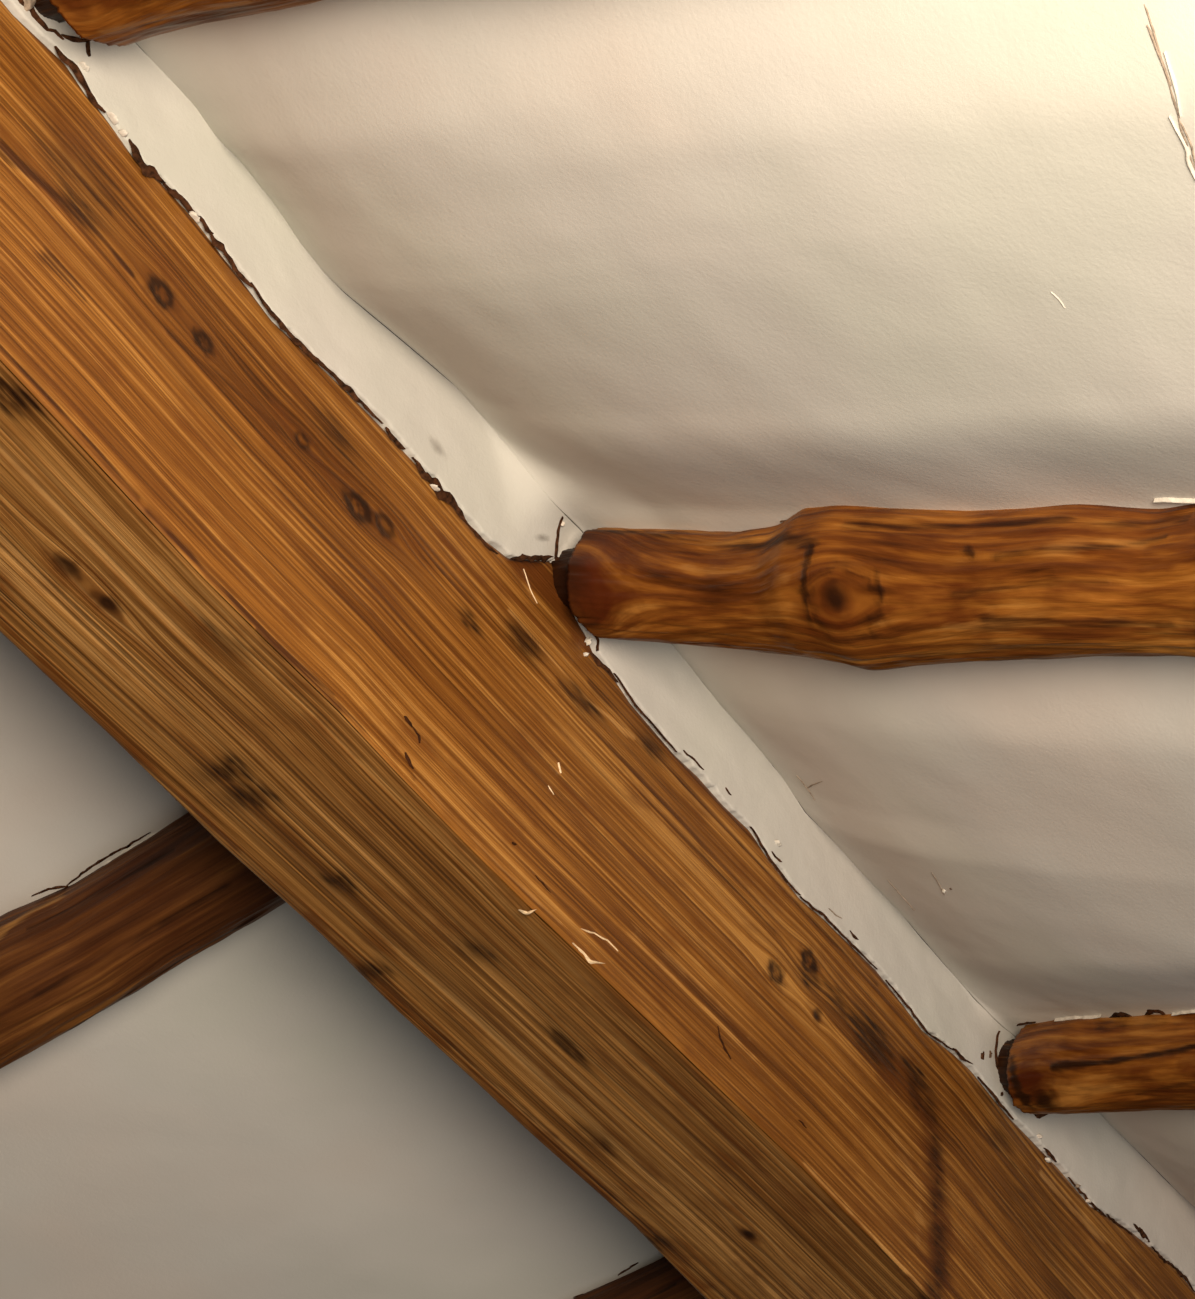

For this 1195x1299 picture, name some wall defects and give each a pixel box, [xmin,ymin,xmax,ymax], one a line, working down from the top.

crack [1144,4,1195,179]
crack [18,0,565,563]
crack [1153,497,1195,505]
crack [576,617,731,795]
crack [750,827,1195,1292]